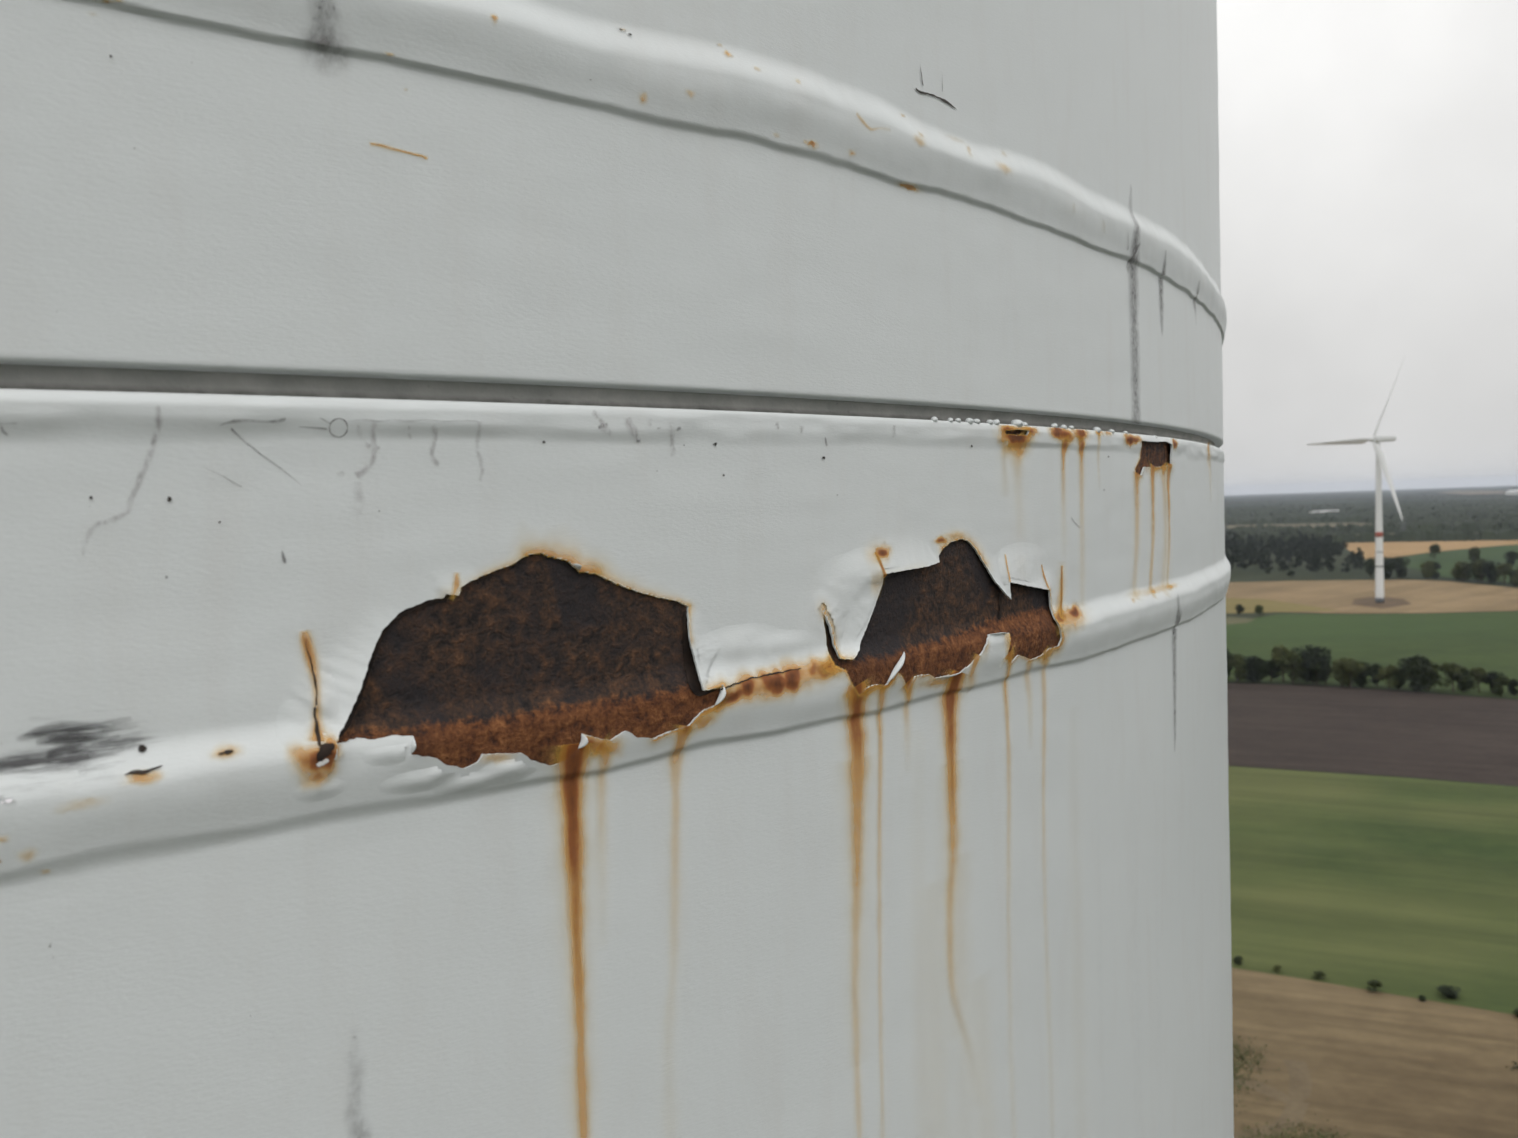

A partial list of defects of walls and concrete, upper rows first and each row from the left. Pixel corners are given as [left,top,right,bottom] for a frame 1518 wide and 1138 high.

corrosion [1002,425,1177,507]
peeling [1135,441,1170,475]
peeling [336,553,726,768]
corrosion [525,550,600,574]
peeling [823,539,1060,688]
corrosion [560,736,616,1138]